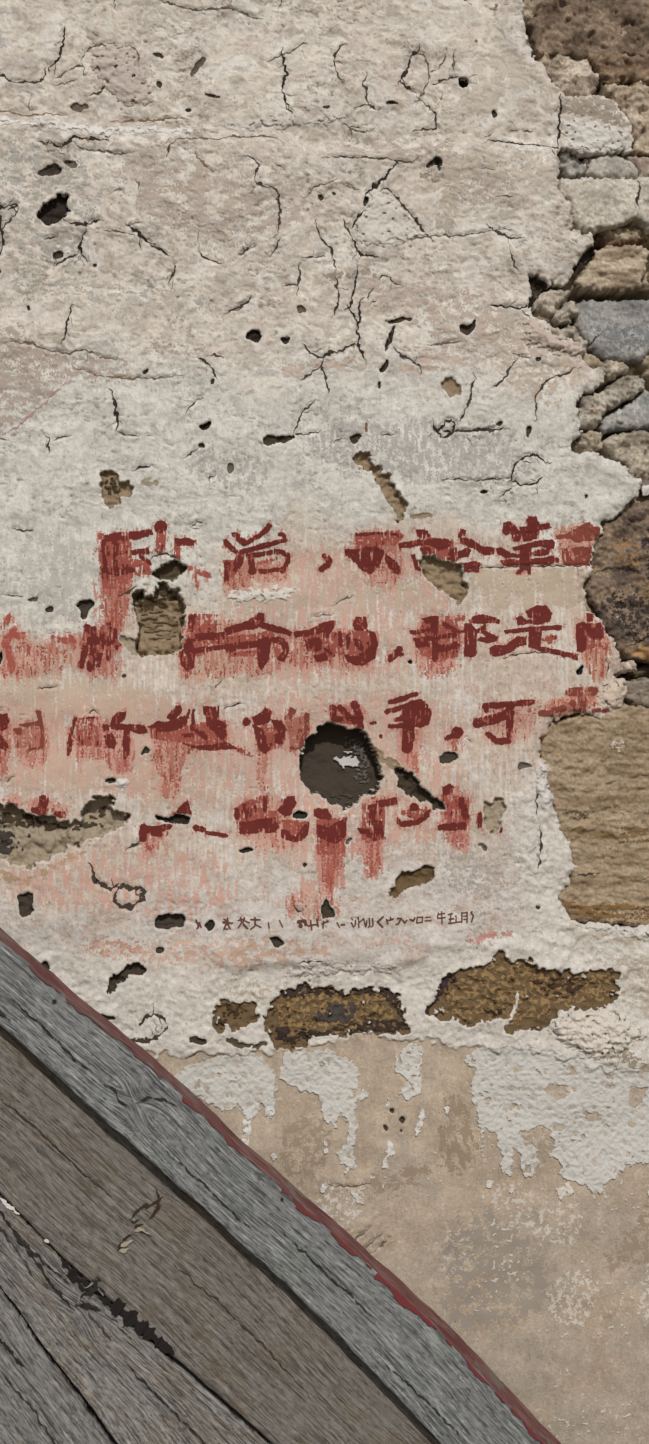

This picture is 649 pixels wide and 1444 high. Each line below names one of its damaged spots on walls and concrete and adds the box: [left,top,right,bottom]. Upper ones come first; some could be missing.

crack [0,0,567,442]
hole [528,276,547,309]
flaking render [572,247,595,273]
crack [0,304,225,481]
crack [429,334,601,496]
flaking render [47,423,608,764]
flaking render [0,693,507,869]
flaking render [189,980,411,1053]
flaking render [425,950,621,1035]
peeling [382,1098,426,1169]
peeling [319,1158,356,1216]
peeling [556,1182,574,1200]